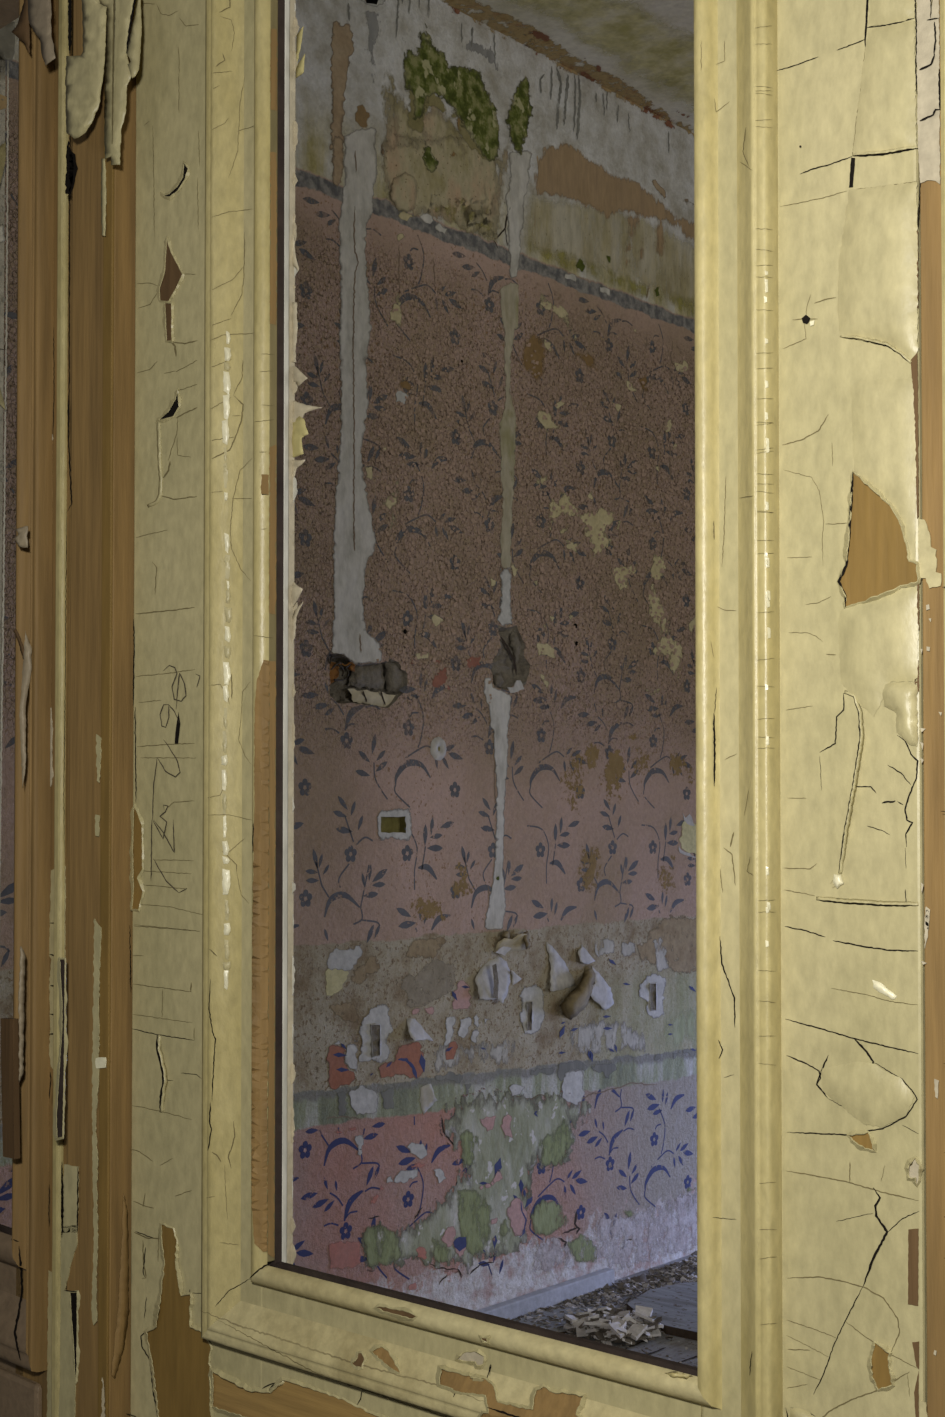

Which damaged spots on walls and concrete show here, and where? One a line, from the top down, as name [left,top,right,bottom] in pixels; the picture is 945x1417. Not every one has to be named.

peeling [0,0,142,236]
crack [133,0,275,801]
peeling [260,152,322,698]
leakage [348,0,695,304]
crack [713,0,921,560]
peeling [837,353,942,630]
peeling [46,919,107,1417]
crack [170,789,254,900]
peeling [251,660,296,1264]
flaking render [361,1070,592,1276]
crack [669,596,945,951]
crack [718,941,945,1417]